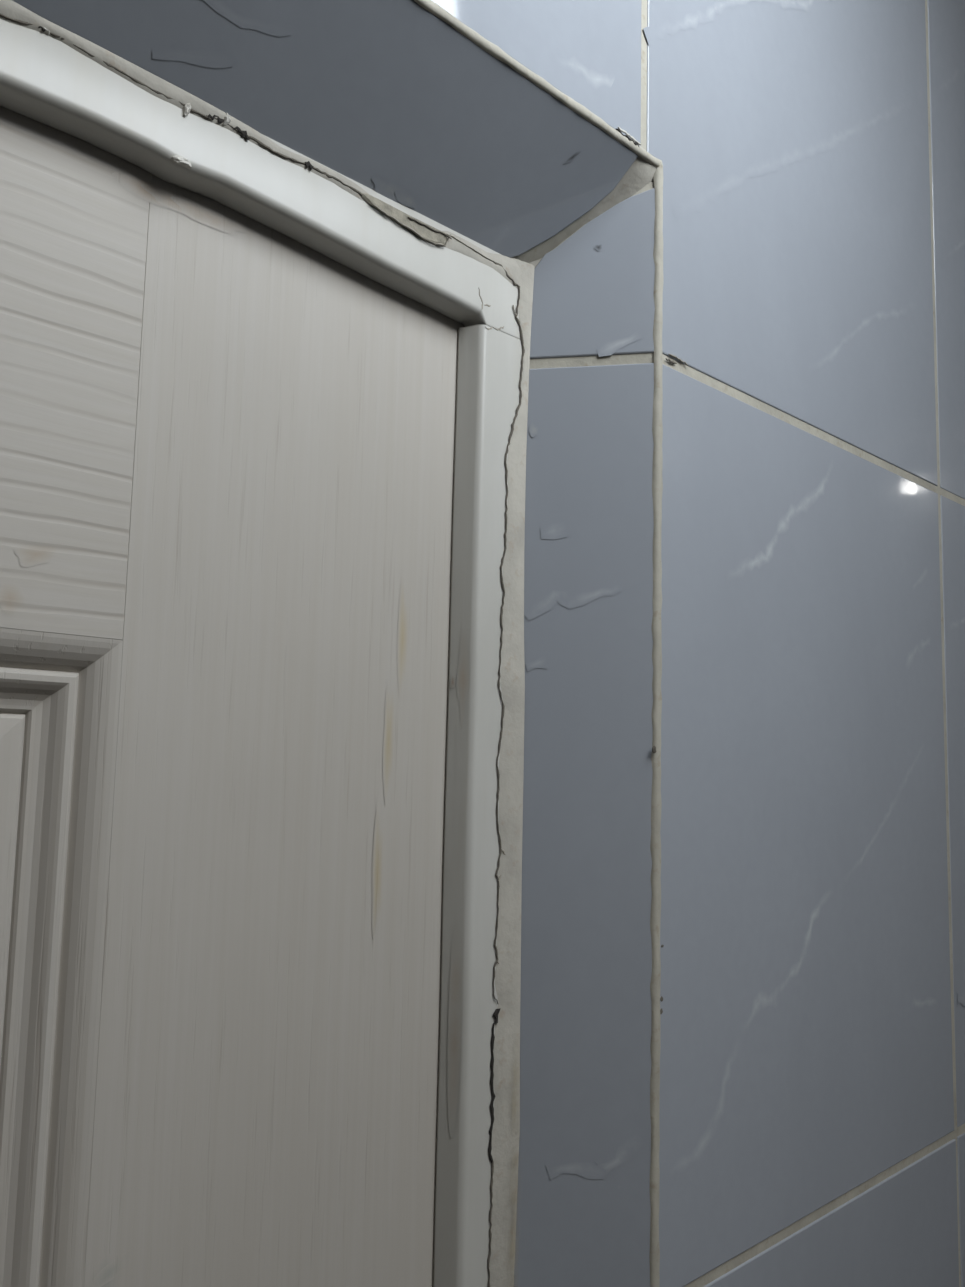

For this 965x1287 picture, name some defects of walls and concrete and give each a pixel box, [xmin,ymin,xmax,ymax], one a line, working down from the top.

crack [0,13,362,196]
crack [446,233,525,1287]